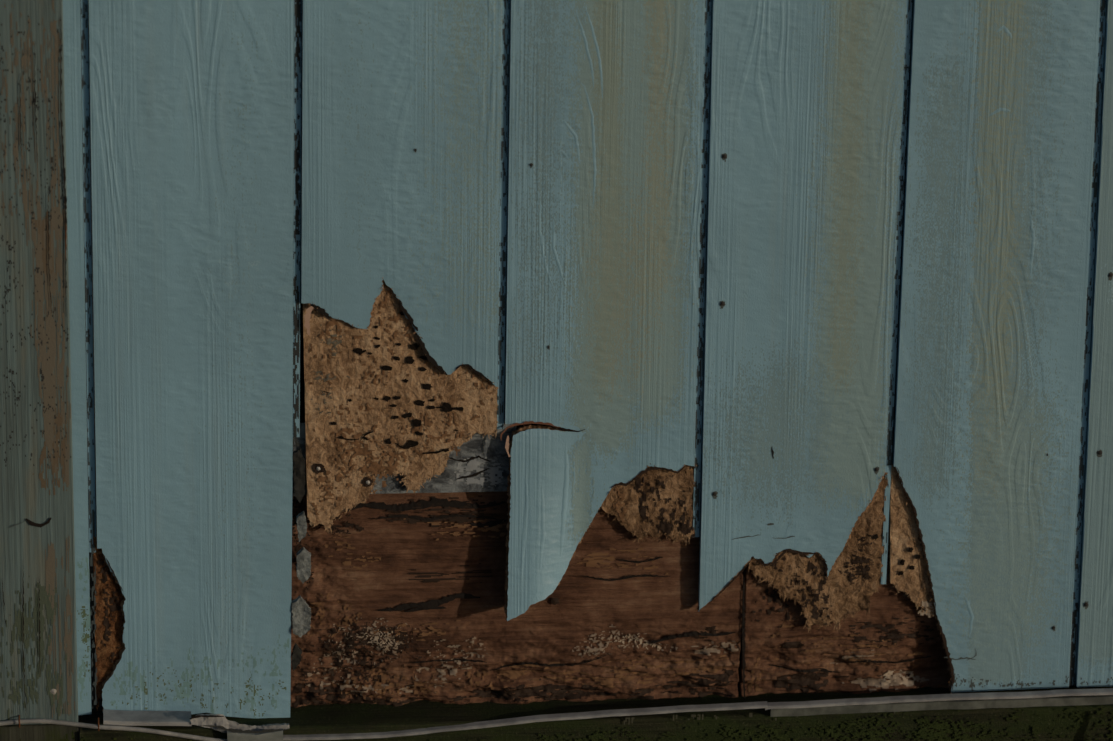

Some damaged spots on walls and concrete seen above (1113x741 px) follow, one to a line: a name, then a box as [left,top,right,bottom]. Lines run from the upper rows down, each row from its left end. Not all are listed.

peeling [1,0,71,495]
peeling [304,303,356,335]
spalling [370,280,494,385]
spalling [101,548,125,689]
peeling [291,448,311,671]
peeling [449,424,532,620]
spalling [717,467,952,689]